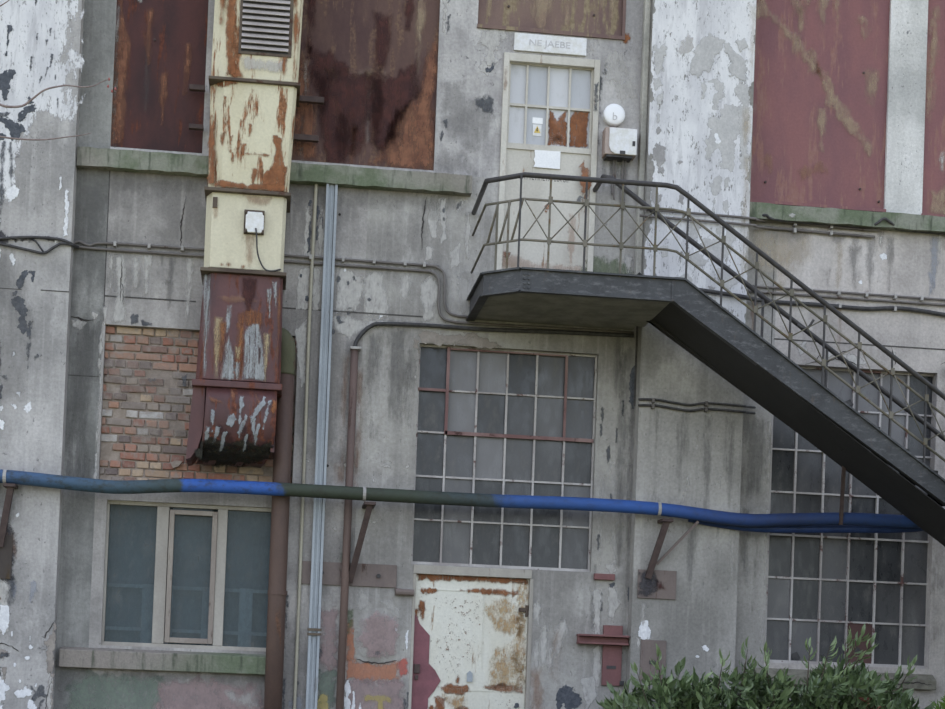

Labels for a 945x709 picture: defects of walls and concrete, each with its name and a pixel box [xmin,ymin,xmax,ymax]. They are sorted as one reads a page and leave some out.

peeling [0,69,37,141]
rust [111,0,130,143]
rust [207,0,437,192]
rust [547,82,599,147]
peeling [679,33,750,213]
peeling [6,185,20,202]
peeling [55,177,69,243]
rust [577,162,592,202]
peeling [678,193,739,290]
peeling [0,249,35,337]
peeling [0,623,57,709]
rust [415,574,528,709]